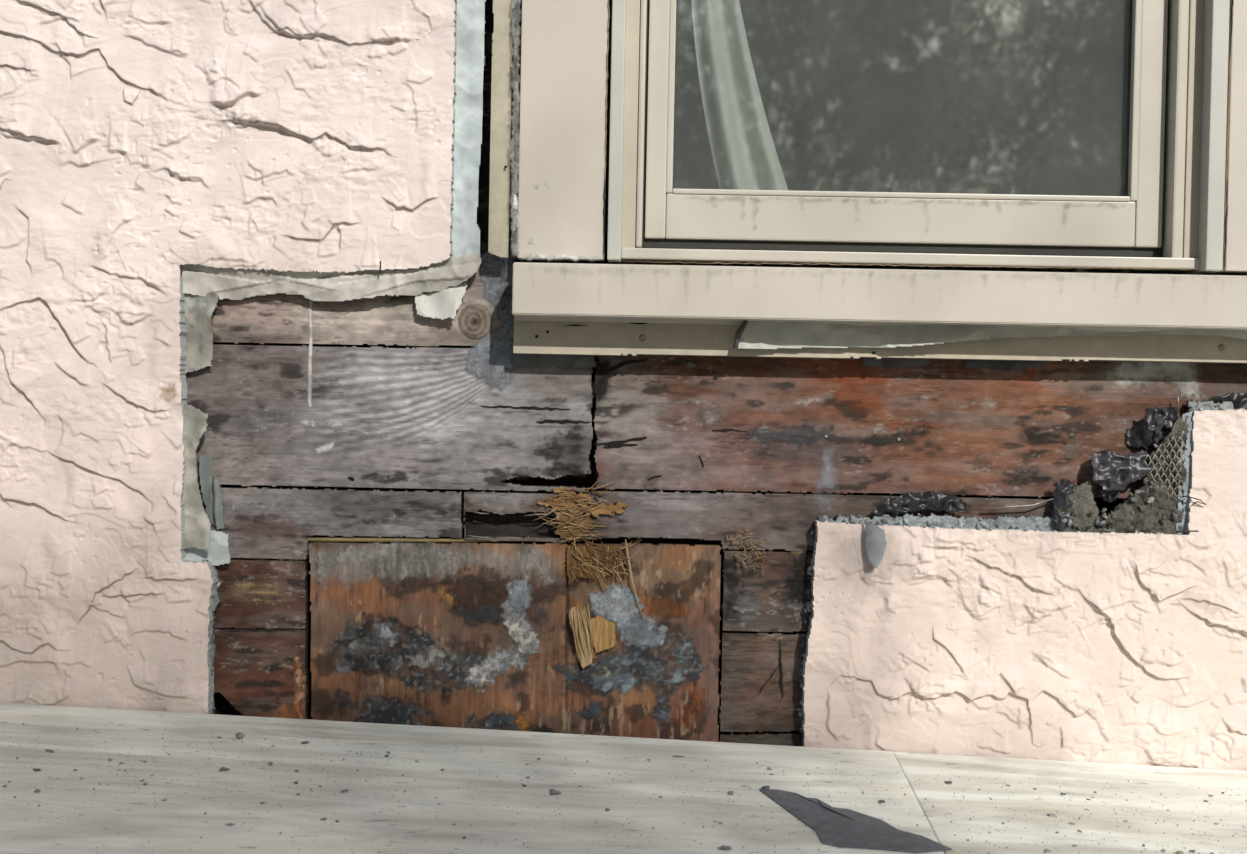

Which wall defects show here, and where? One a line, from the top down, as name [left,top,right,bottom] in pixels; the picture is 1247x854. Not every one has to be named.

crack [481,405,647,448]
spalling [810,512,1058,535]
spalling [1176,400,1247,534]
spalling [202,560,222,714]
leakage [269,545,510,627]
leakage [331,612,486,726]
peeling [465,579,554,692]
leakage [465,712,555,733]
leakage [553,631,705,730]
spalling [797,558,813,734]